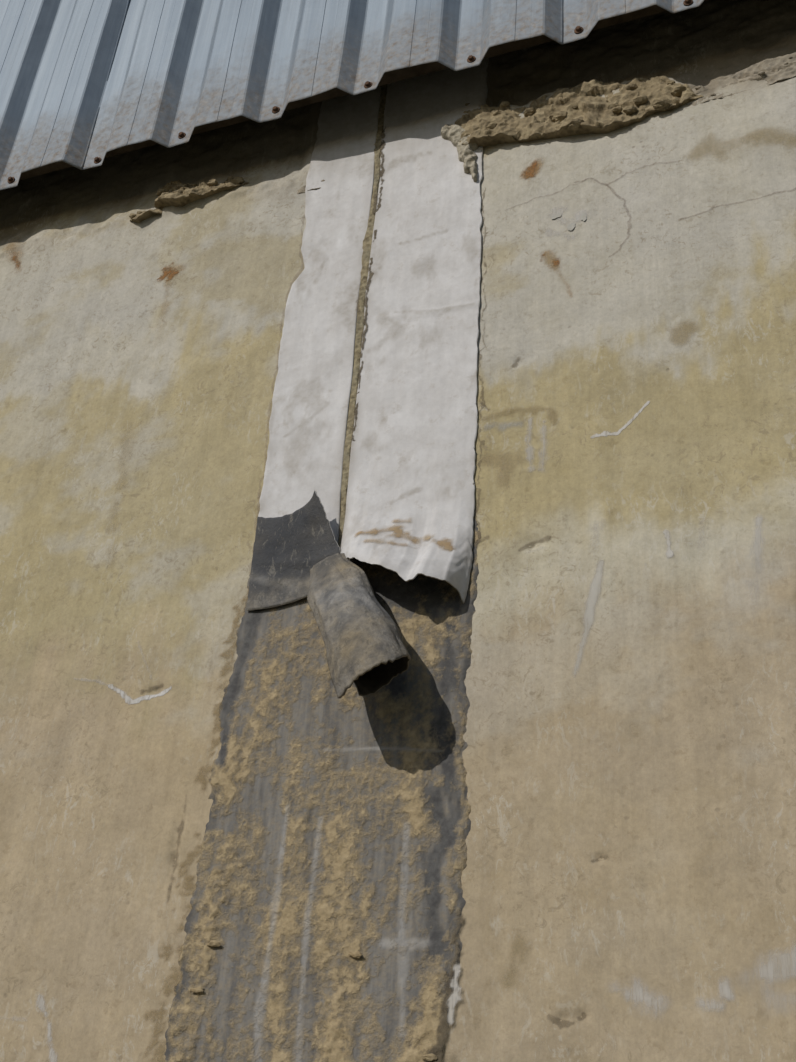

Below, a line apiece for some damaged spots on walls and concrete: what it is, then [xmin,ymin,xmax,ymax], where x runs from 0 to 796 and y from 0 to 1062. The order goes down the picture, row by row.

corrosion [523,162,541,179]
corrosion [157,267,179,281]
corrosion [356,520,453,551]
peeling [129,52,796,1062]